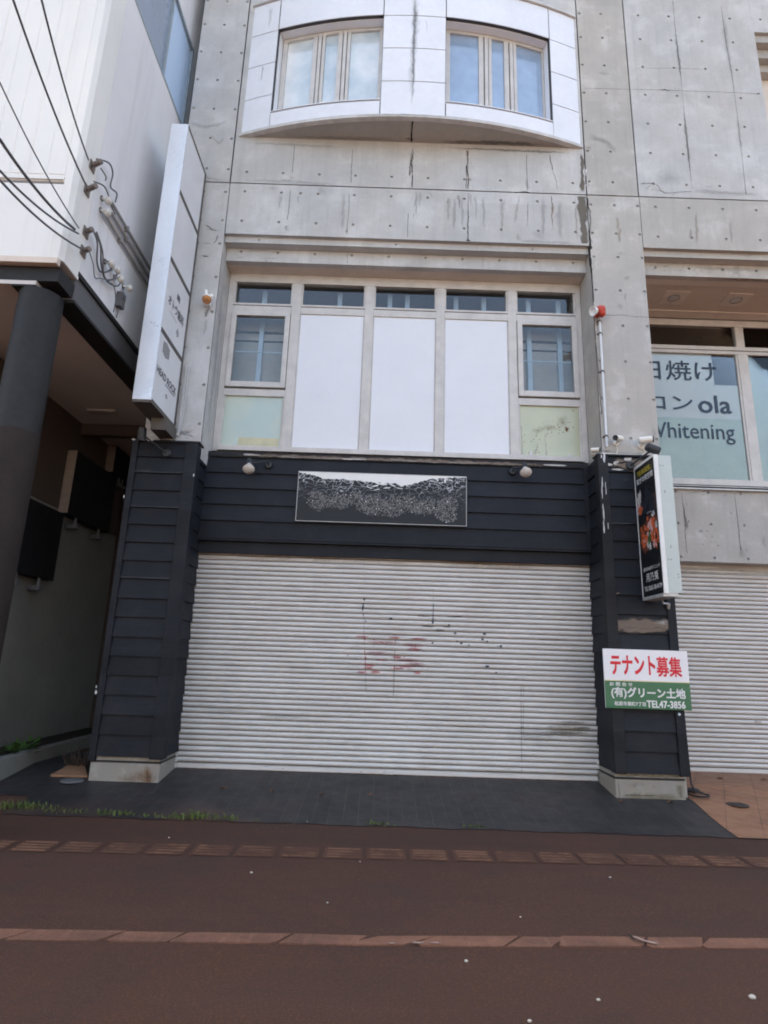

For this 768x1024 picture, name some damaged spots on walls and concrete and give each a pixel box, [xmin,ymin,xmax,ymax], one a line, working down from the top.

crack [634,7,760,192]
crack [407,149,417,237]
leakage [577,156,588,244]